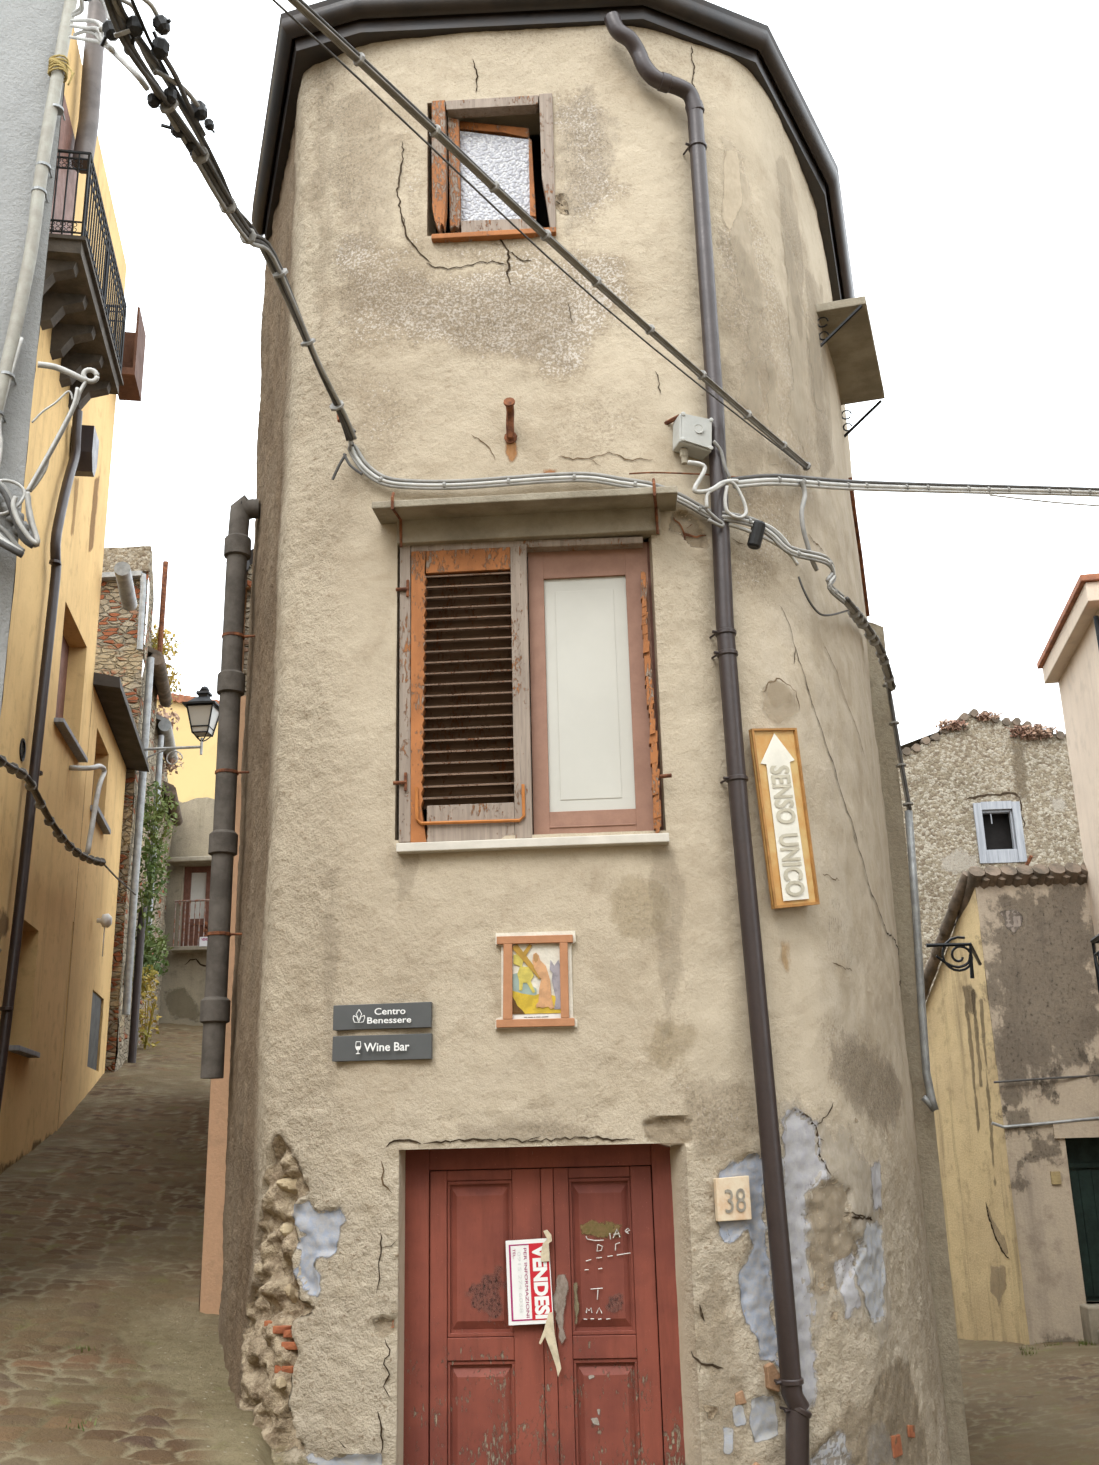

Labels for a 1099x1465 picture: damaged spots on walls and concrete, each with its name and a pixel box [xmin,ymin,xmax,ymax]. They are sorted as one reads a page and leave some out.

crack [396,141,531,285]
water stain [990,887,1099,1158]
spalling [239,1134,382,1465]
peeling [718,1153,780,1454]
peeling [782,1107,890,1410]